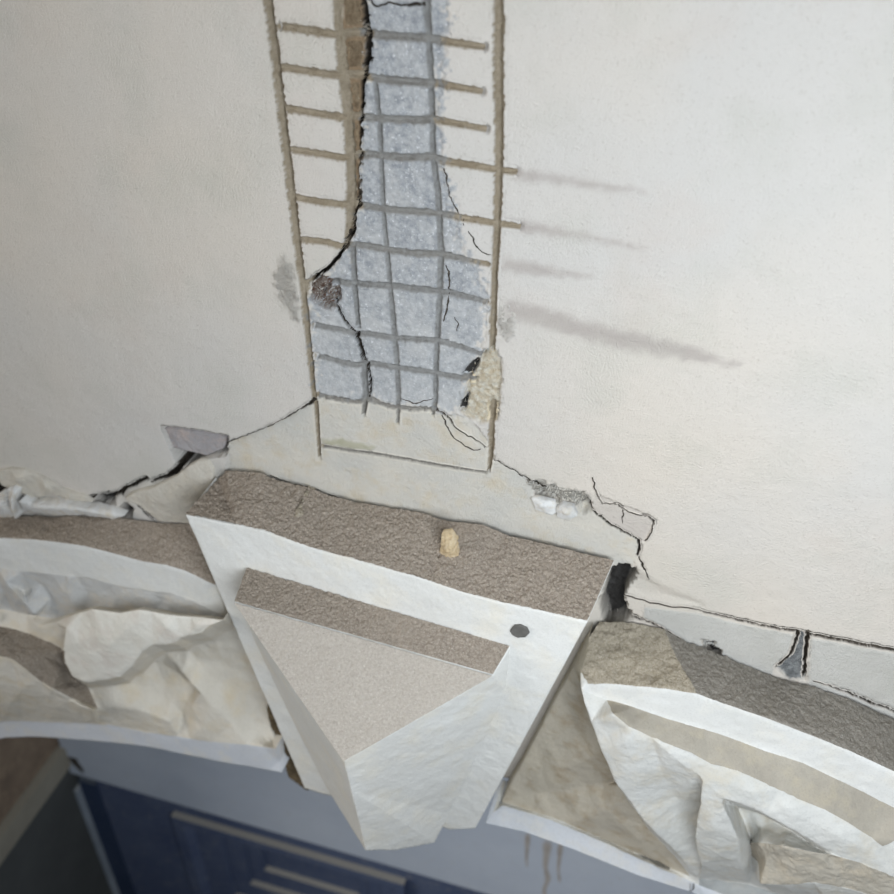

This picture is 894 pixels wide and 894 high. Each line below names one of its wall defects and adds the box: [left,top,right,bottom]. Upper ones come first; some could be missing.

spalling [345,0,422,30]
spalling [347,39,424,75]
crack [309,0,426,282]
spalling [357,162,432,206]
spalling [341,213,434,247]
crack [334,297,373,397]
peeling [0,467,135,520]
crack [92,451,198,523]
crack [227,397,317,443]
spalling [160,222,697,694]
crack [403,399,547,487]
crack [589,477,894,713]